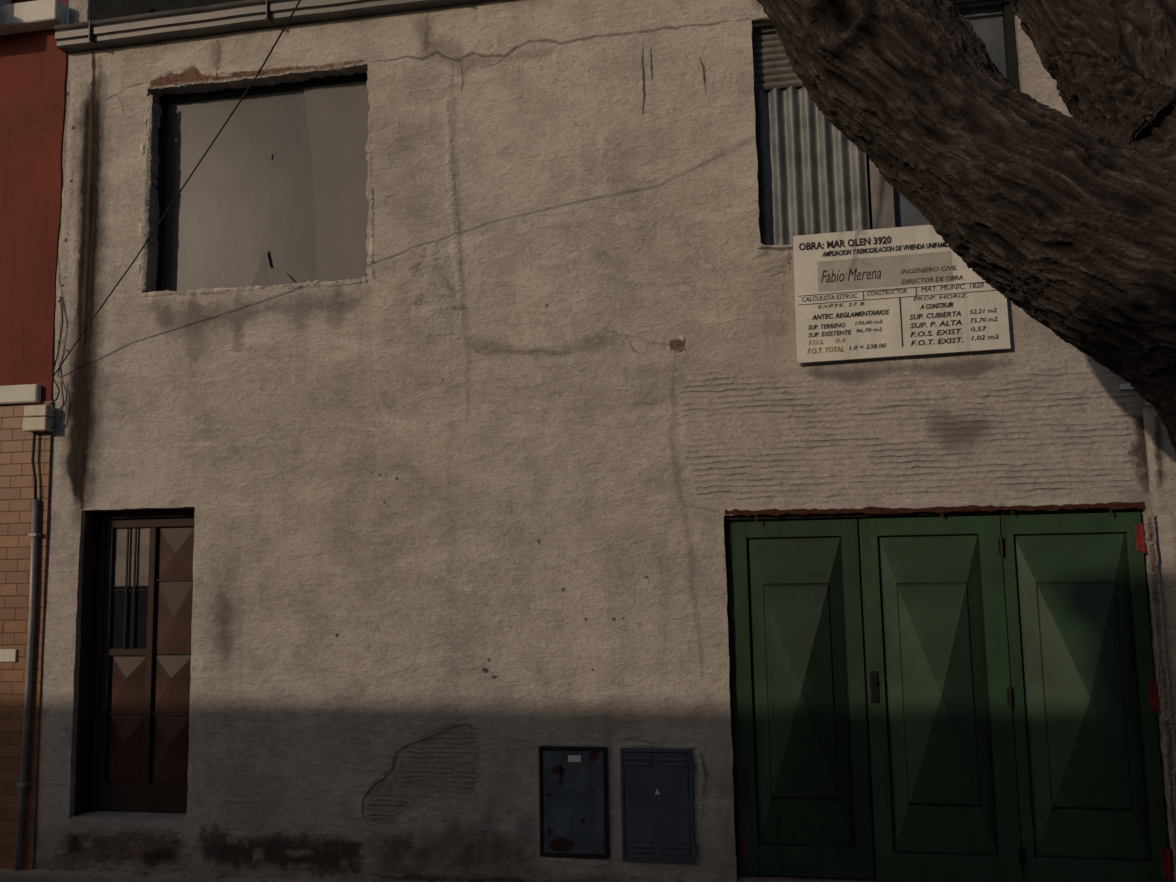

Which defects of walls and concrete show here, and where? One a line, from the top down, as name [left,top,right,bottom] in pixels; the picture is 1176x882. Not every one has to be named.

water stain [68,52,99,509]
flaking render [137,59,376,297]
crack [642,44,653,116]
water stain [198,827,362,877]